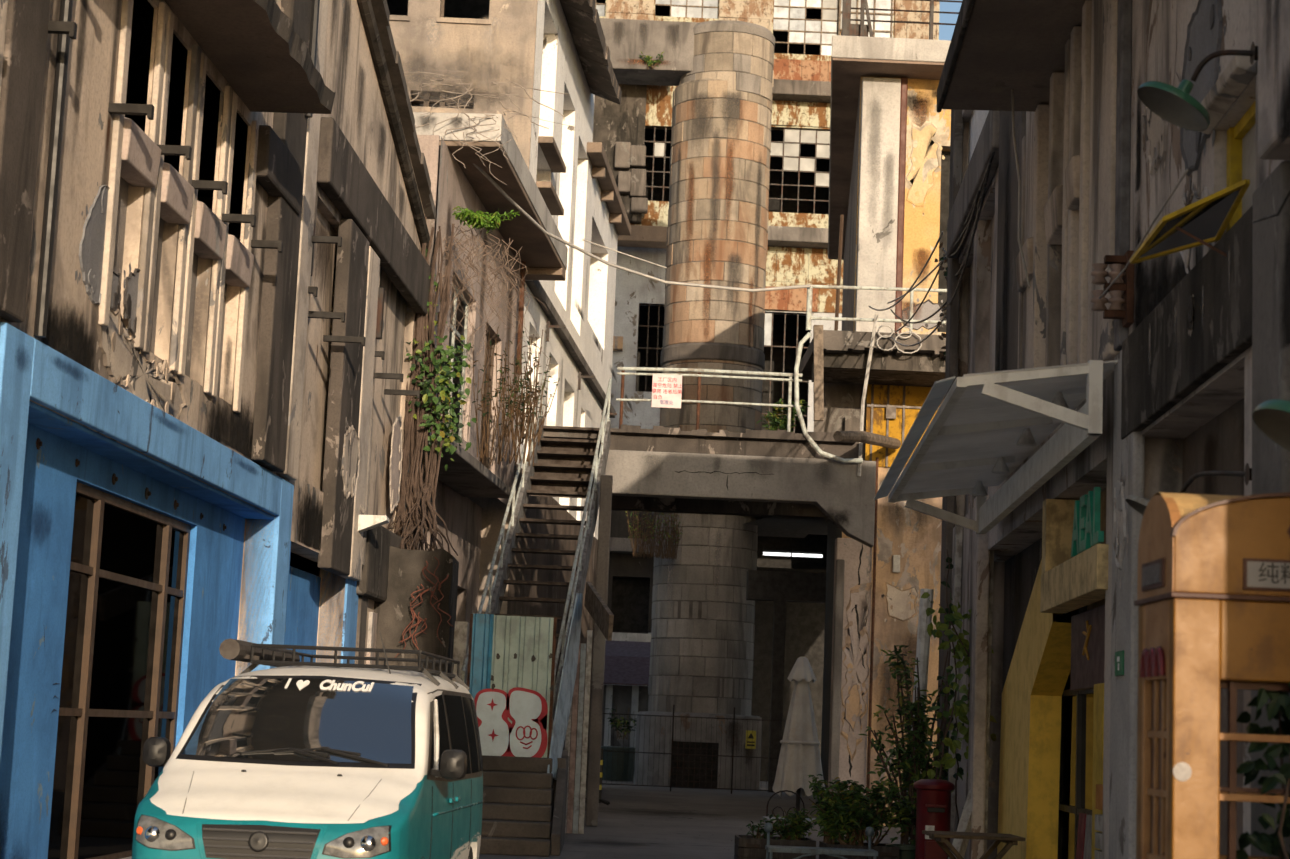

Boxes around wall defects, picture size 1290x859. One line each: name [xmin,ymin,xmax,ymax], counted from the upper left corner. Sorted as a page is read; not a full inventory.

flaking render [1181,0,1226,103]
flaking render [906,116,945,216]
flaking render [75,182,194,420]
crack [675,470,771,490]
crack [852,545,865,668]
flaking render [840,565,920,761]